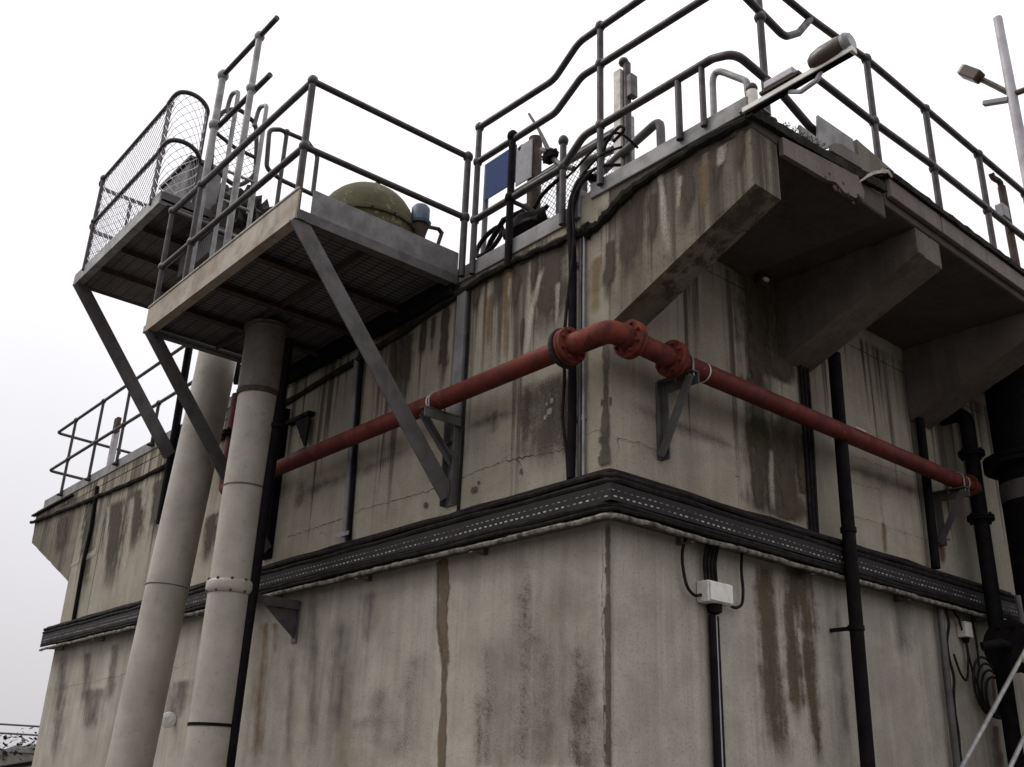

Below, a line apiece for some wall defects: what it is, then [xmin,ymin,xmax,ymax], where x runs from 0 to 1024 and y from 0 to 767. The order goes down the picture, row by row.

damp [602,129,745,294]
damp [391,307,450,395]
damp [521,375,568,457]
crack [465,430,657,477]
damp [763,415,806,521]
damp [80,479,163,583]
damp [204,513,218,557]
damp [570,650,595,767]
damp [774,567,821,753]